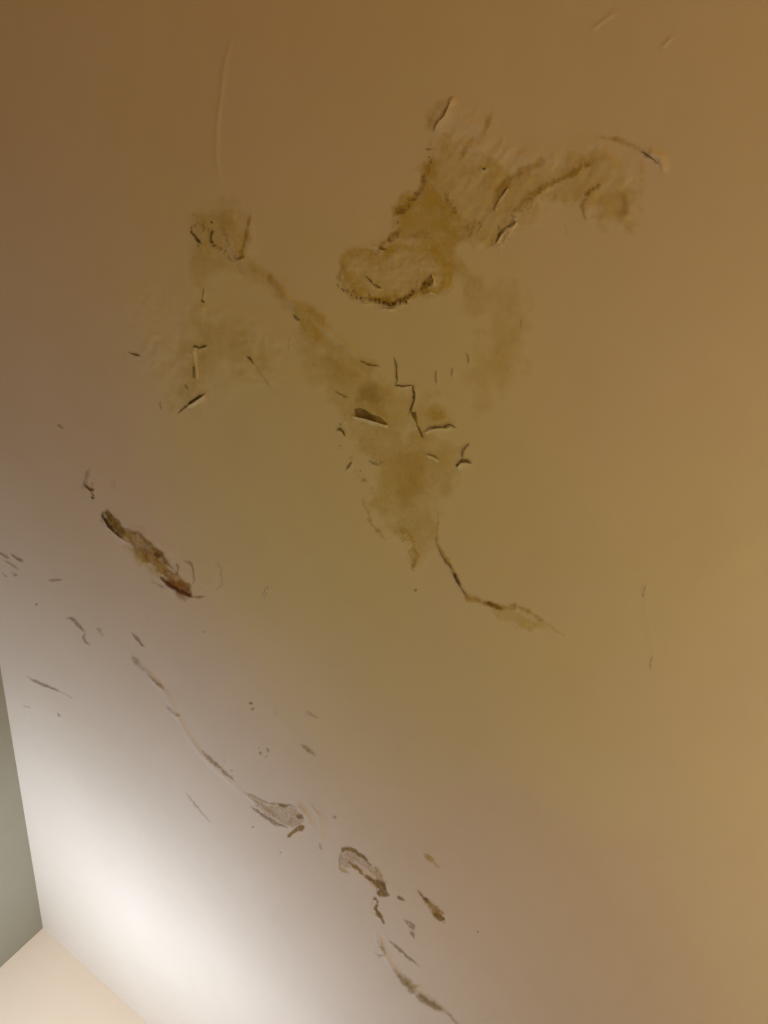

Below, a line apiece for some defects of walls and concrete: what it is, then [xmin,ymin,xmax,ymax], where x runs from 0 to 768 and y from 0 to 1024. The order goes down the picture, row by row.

peeling [334,363,423,444]
crack [424,424,458,466]
flaking render [97,512,194,589]
crack [437,538,469,586]
flaking render [242,791,316,837]
flaking render [332,848,453,1017]